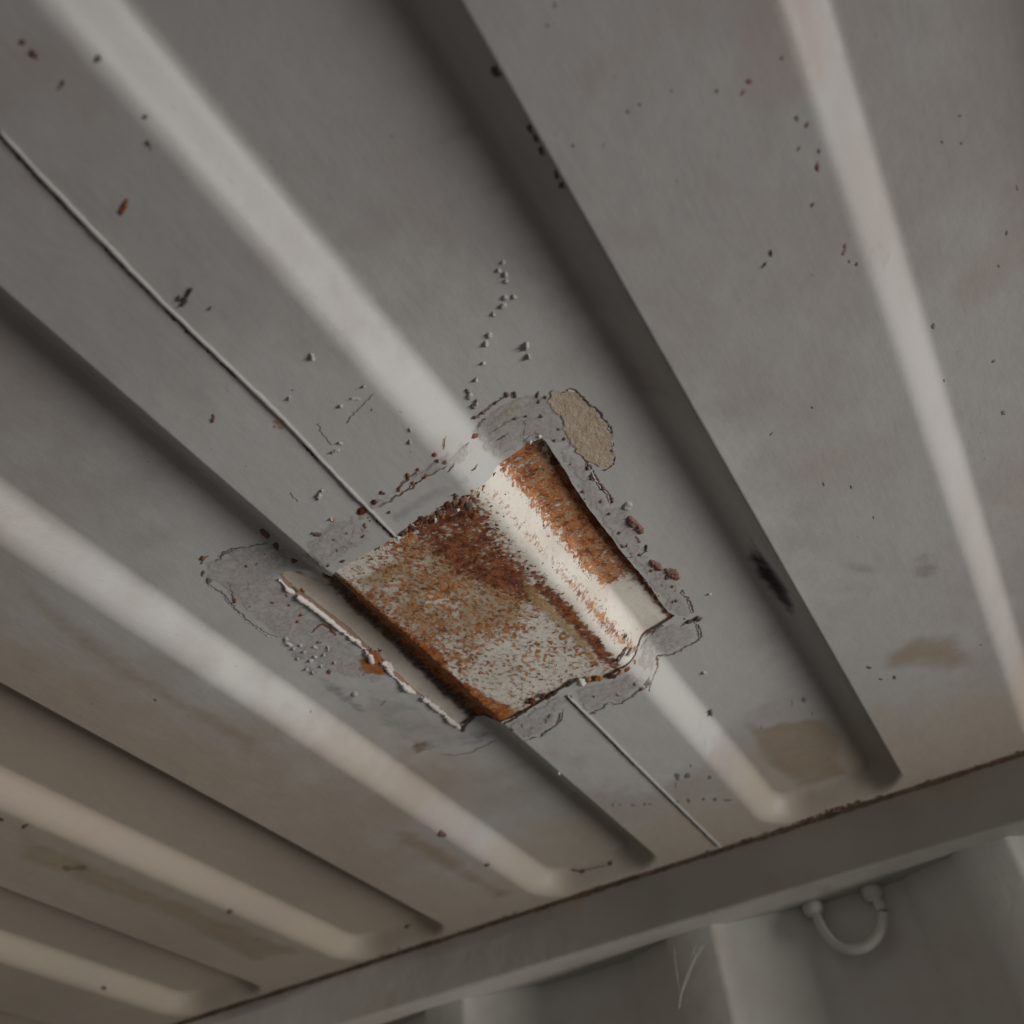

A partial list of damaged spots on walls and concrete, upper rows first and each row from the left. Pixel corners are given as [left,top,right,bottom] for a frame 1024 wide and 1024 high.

rust [324,440,672,724]
peeling [302,388,703,742]
rust [650,559,680,581]